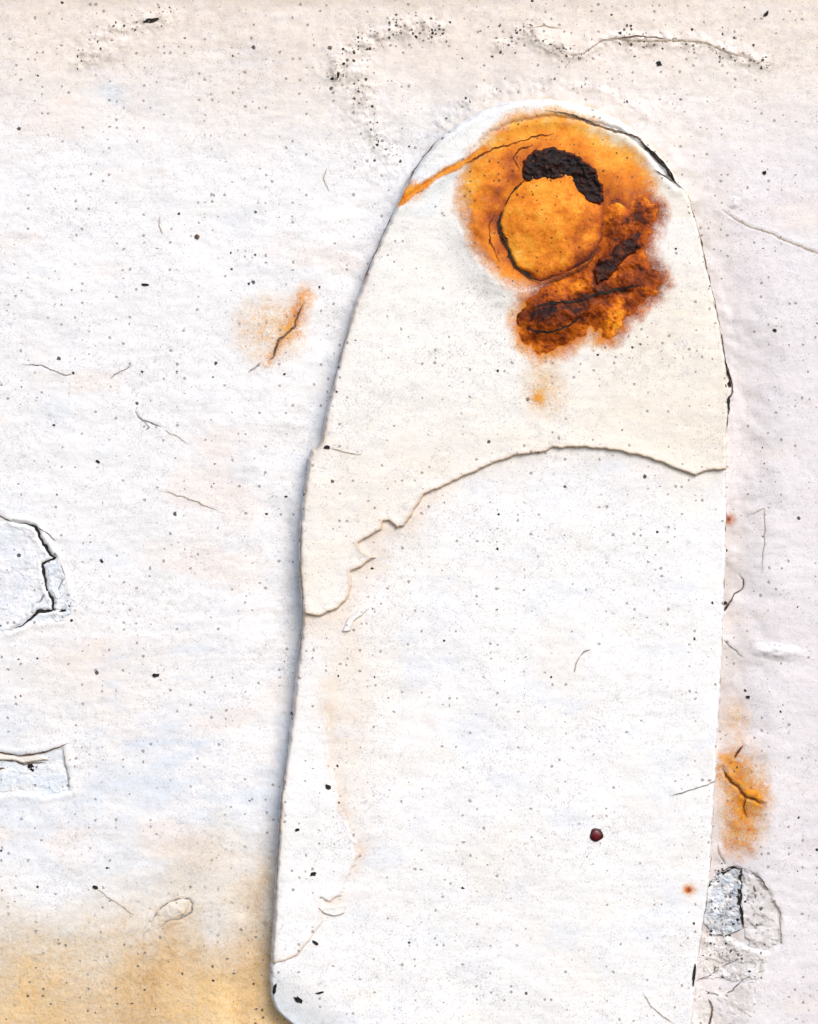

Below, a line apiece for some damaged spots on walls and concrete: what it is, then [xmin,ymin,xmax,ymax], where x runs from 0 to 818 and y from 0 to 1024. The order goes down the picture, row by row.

rust [398,107,672,404]
rust [254,291,310,347]
peeling [298,99,732,632]
spalling [0,521,74,631]
peeling [0,743,69,797]
peeling [270,710,361,964]
rust [718,752,767,847]
water stain [0,915,291,1024]
spalling [692,866,782,1024]